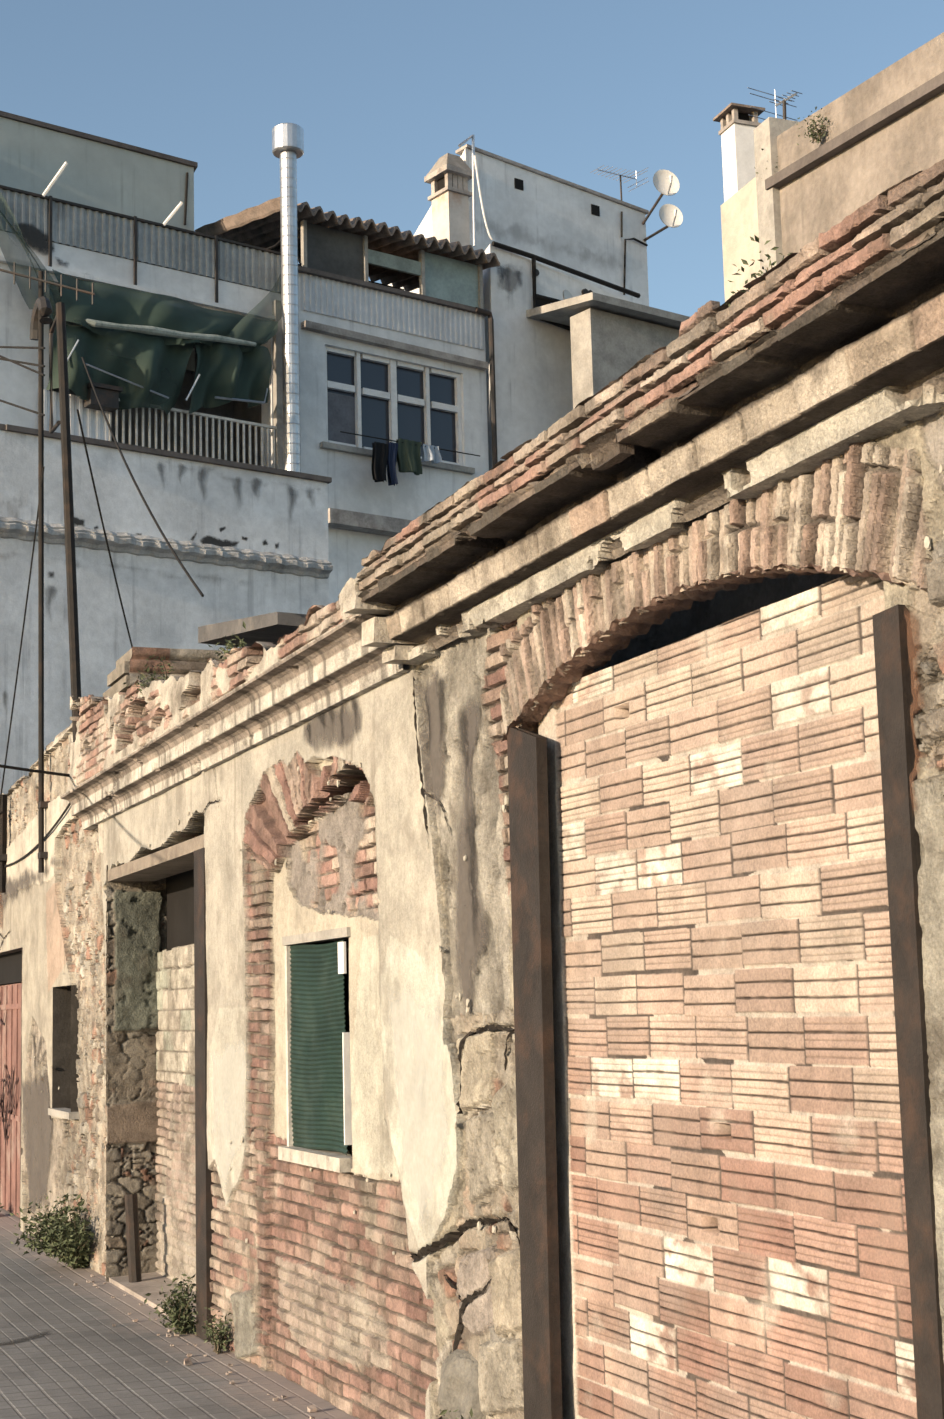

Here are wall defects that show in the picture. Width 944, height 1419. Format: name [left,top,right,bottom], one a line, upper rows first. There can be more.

peeling [191,527,279,548]
spalling [906,531,944,775]
spalling [916,407,944,497]
spalling [21,810,205,1278]
spalling [208,619,524,1419]